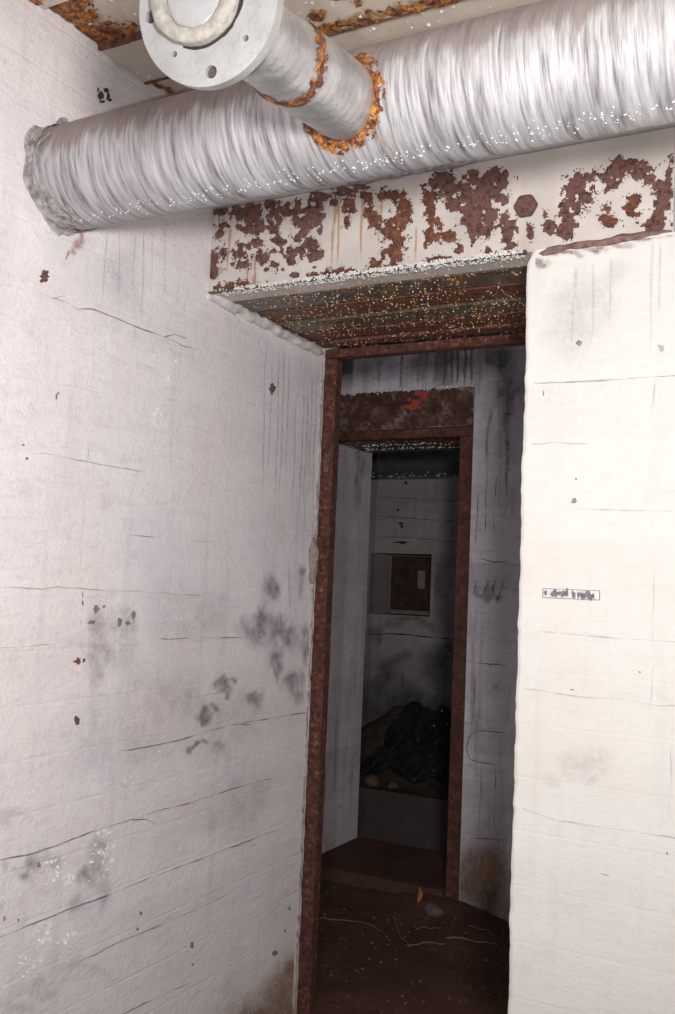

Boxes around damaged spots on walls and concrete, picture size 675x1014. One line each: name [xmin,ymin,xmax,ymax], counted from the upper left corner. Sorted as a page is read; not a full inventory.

rust [29,0,143,51]
rust [143,76,174,94]
rust [302,52,390,159]
rust [254,0,462,107]
rust [210,153,674,291]
rust [344,350,474,430]
damp [199,706,217,726]